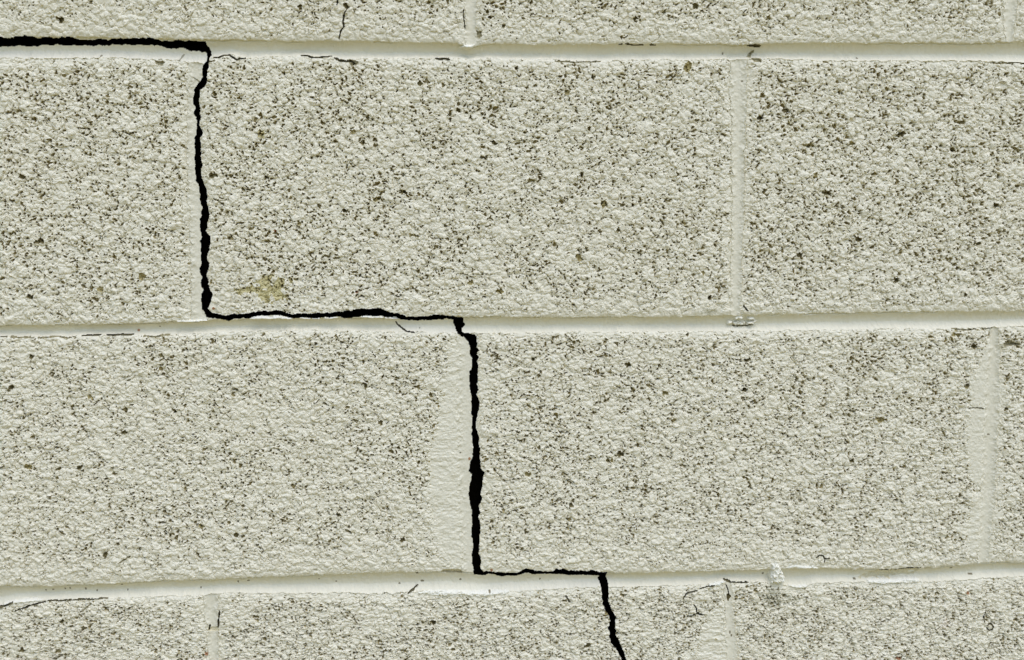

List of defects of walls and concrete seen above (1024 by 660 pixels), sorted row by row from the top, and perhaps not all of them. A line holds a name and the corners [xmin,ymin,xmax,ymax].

crack [0,35,626,660]
crack [555,43,656,64]